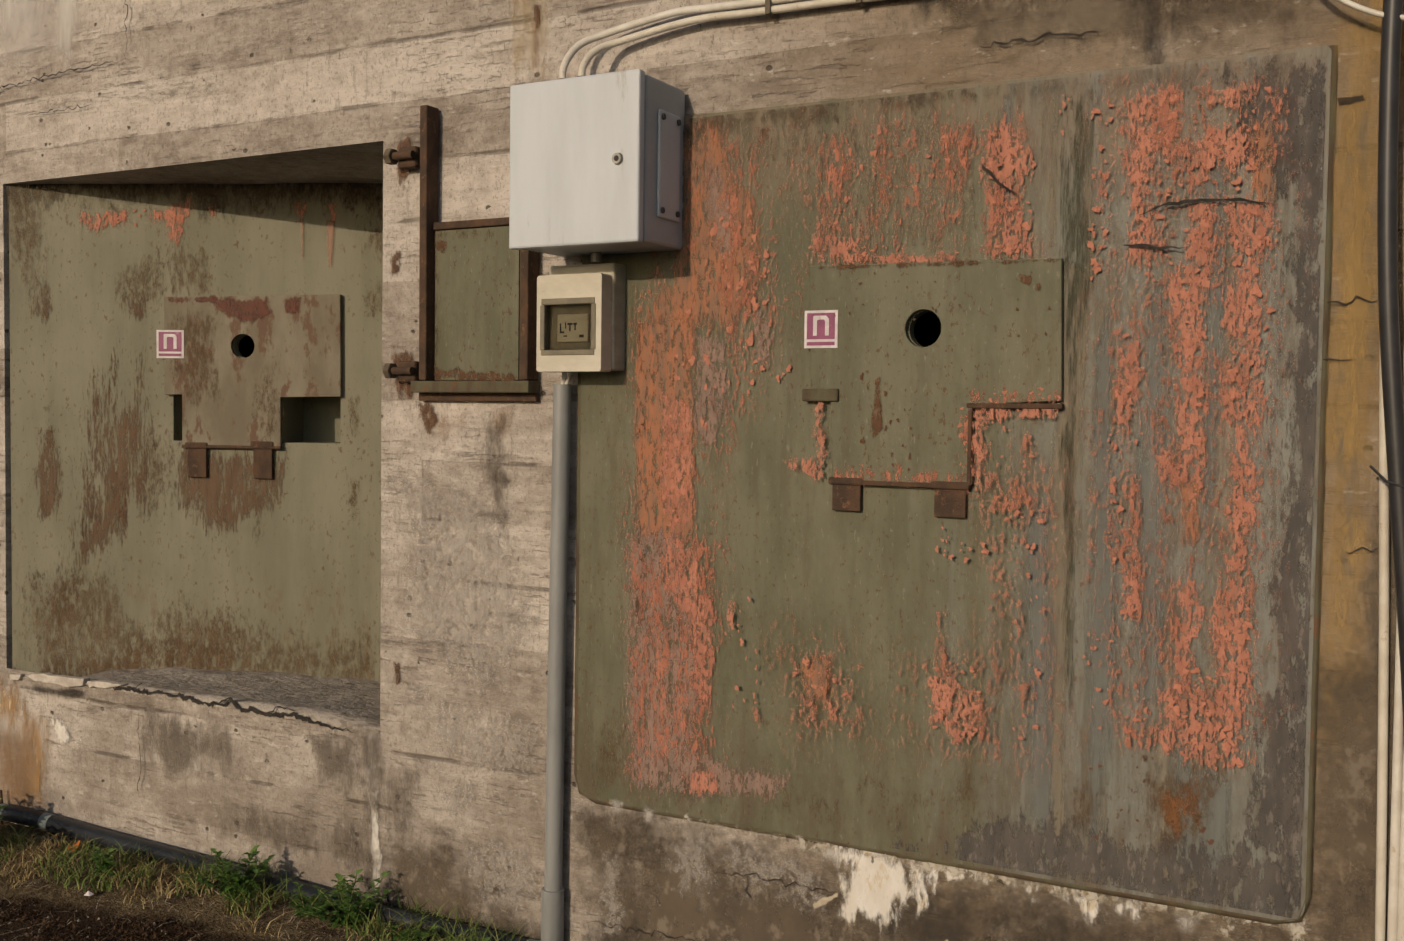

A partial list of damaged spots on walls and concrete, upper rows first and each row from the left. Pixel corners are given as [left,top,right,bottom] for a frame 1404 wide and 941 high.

corrosion [22,348,374,679]
corrosion [6,137,410,323]
peeling [617,104,1061,803]
water stain [1134,288,1167,702]
peeling [1082,68,1289,786]
water stain [1204,162,1224,485]
water stain [1327,46,1378,489]
crack [85,683,353,791]
water stain [580,815,1205,941]
water stain [1176,754,1231,876]
water stain [1221,508,1396,941]